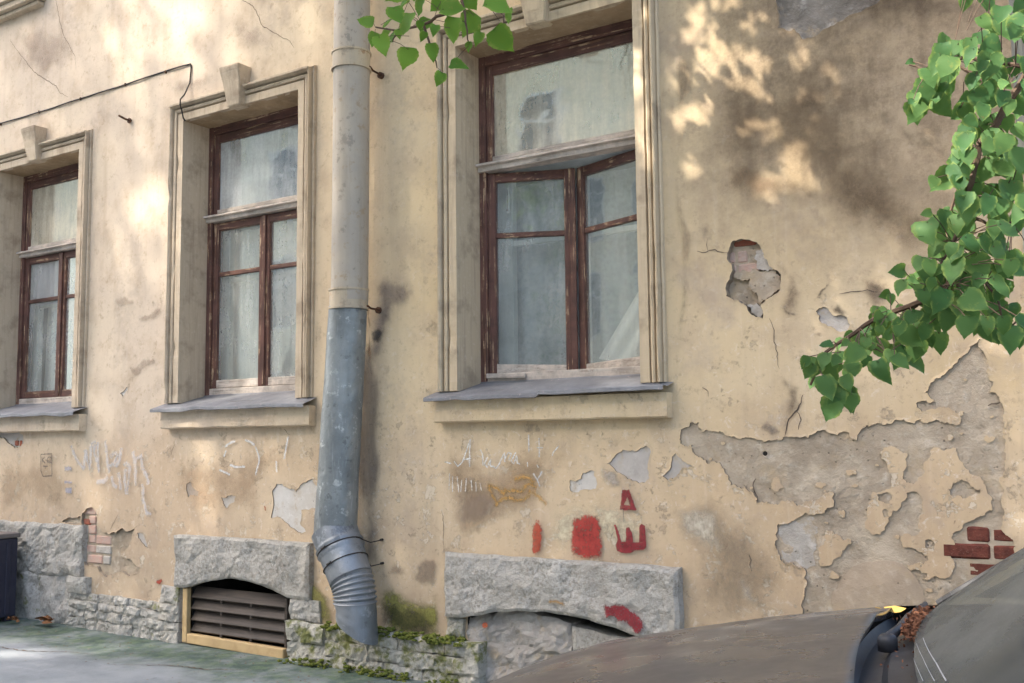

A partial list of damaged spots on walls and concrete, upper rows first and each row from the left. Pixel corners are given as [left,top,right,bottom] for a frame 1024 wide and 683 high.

peeling [773,0,883,42]
spalling [723,236,784,321]
peeling [814,305,853,334]
crack [785,395,803,435]
peeling [568,337,1019,614]
peeling [270,478,317,535]
peeling [58,506,149,579]